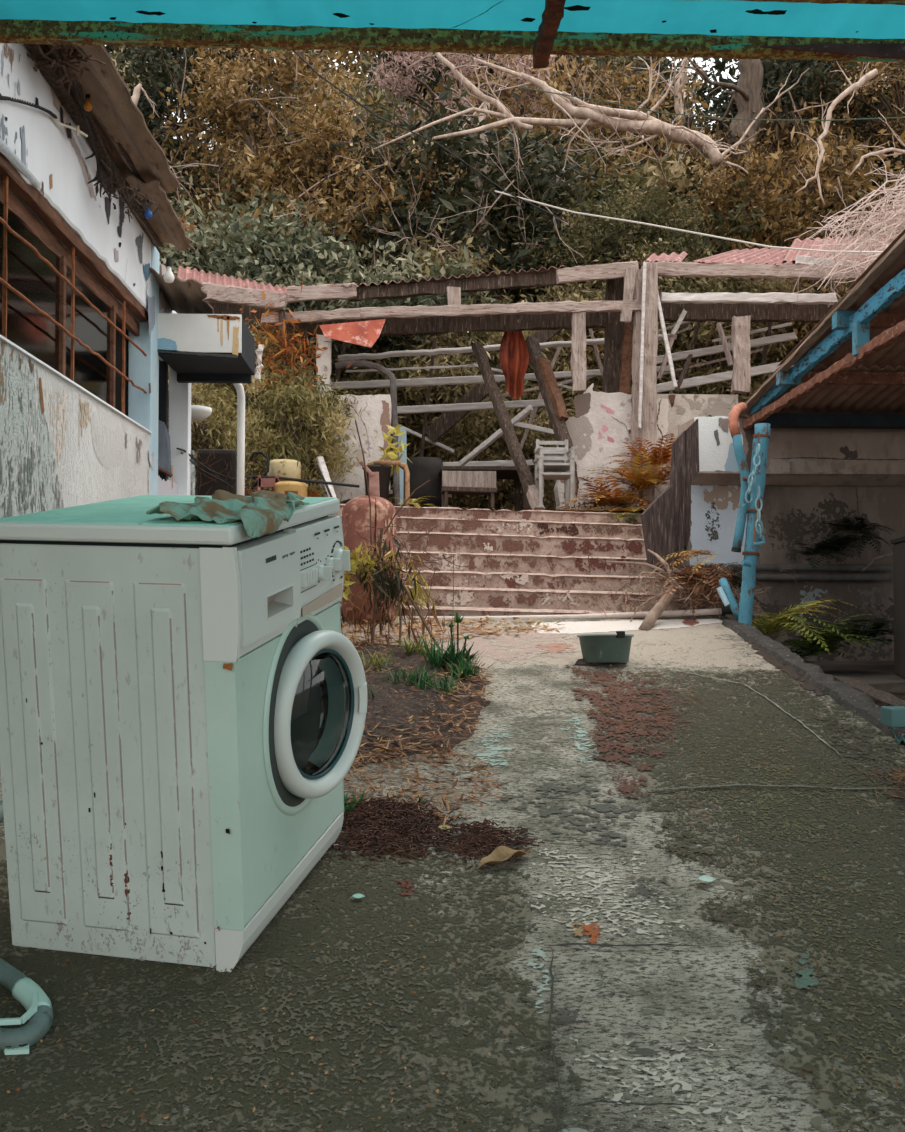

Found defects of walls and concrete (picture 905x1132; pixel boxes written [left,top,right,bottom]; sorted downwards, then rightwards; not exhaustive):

peeling [483,519,533,552]
water stain [768,492,875,564]
peeling [436,552,529,607]
peeling [341,619,786,672]